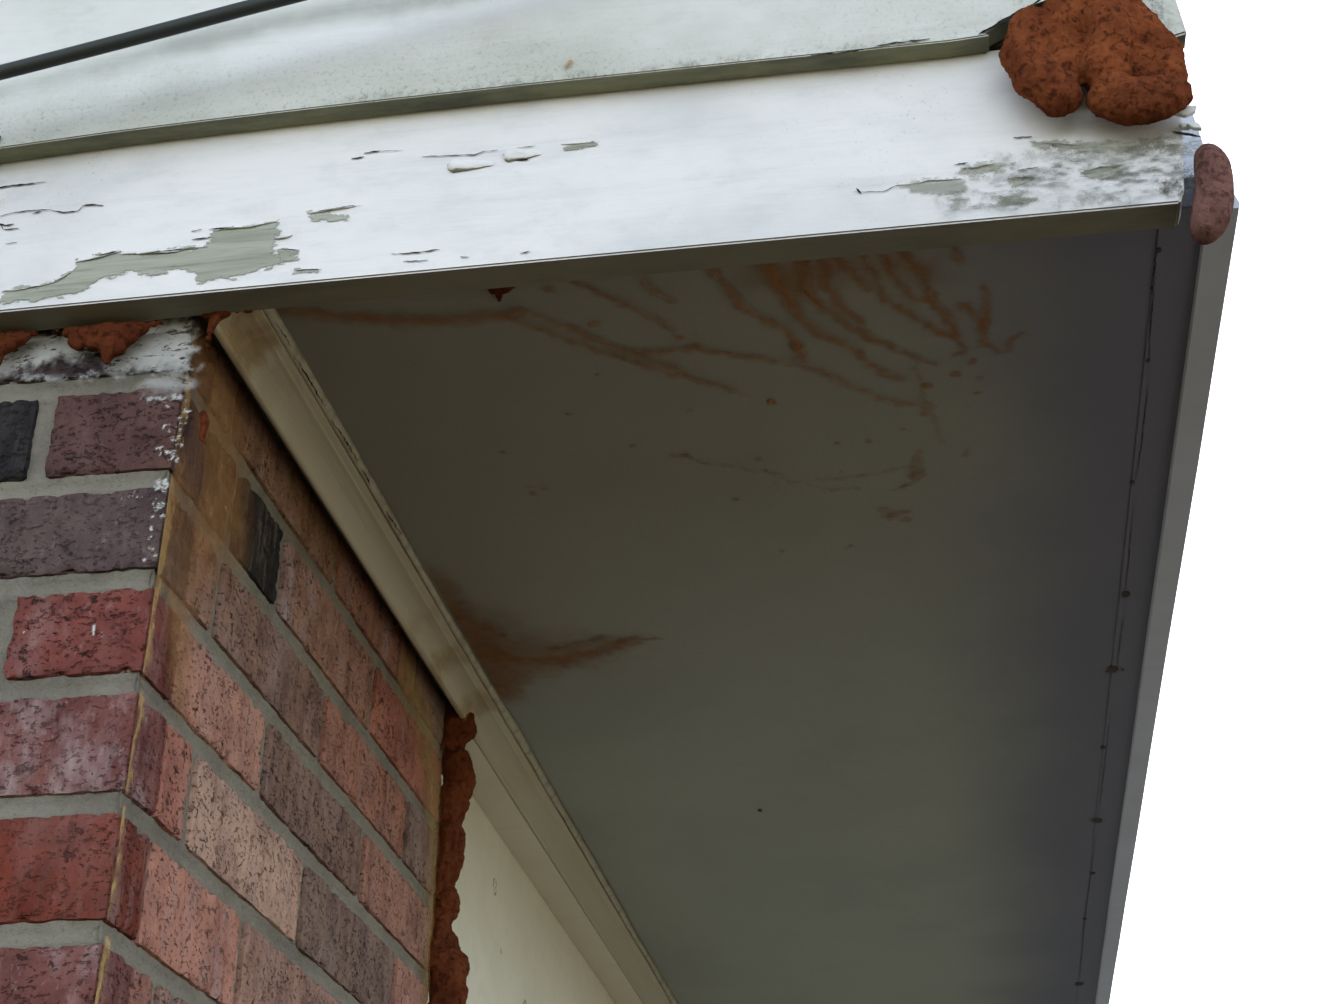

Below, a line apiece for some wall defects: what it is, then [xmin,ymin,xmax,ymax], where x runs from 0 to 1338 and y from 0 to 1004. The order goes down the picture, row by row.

peeling [561,141,598,150]
peeling [856,161,1039,209]
peeling [1013,136,1137,186]
peeling [307,205,355,222]
peeling [0,219,319,304]
damp [147,380,182,401]